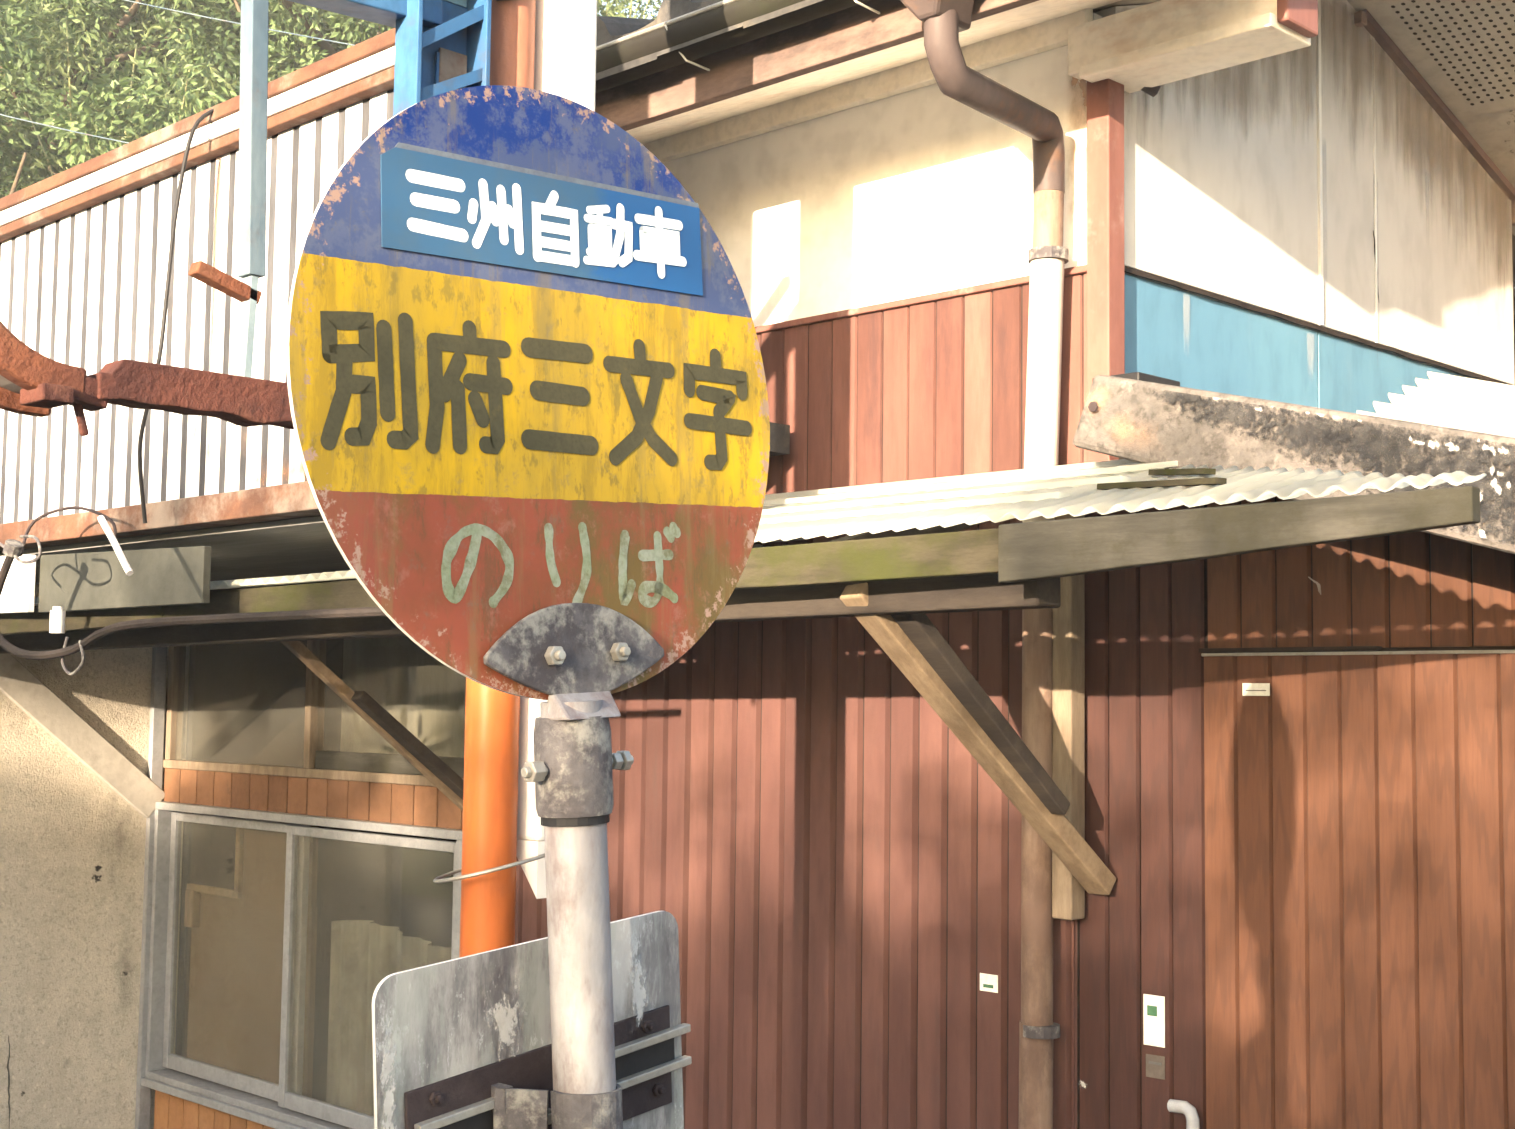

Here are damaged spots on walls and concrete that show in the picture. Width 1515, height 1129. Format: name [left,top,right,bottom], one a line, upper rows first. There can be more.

damp [1147,390,1515,545]
crack [4,1036,12,1128]